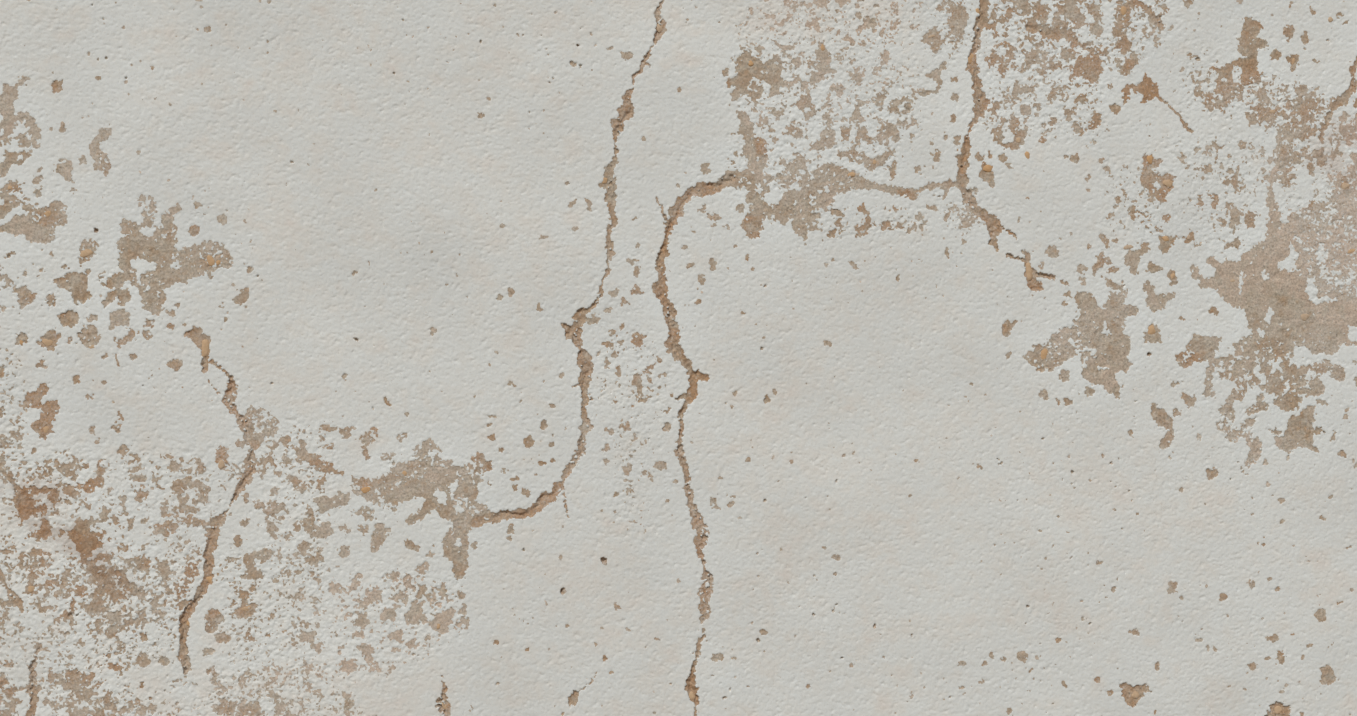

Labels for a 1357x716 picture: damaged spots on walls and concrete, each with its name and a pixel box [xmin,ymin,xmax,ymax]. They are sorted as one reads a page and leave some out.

crack [178,326,260,678]
peeling [0,76,531,716]
crack [471,0,667,527]
peeling [586,243,673,513]
crack [652,174,737,716]
crack [955,0,1069,292]
peeling [681,0,1357,473]
peeling [1206,467,1219,480]
crack [1319,57,1357,142]